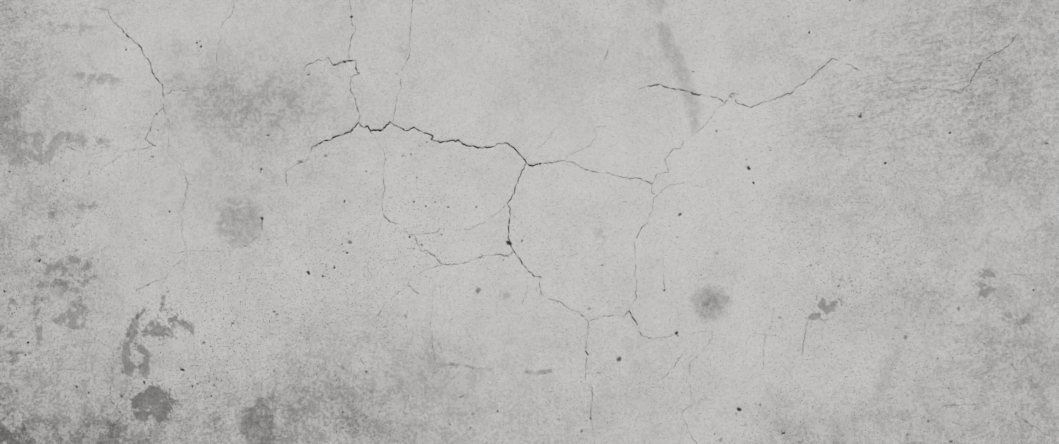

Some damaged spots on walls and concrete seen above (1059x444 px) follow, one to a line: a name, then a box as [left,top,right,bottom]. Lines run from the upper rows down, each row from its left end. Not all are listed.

crack [319,121,541,277]